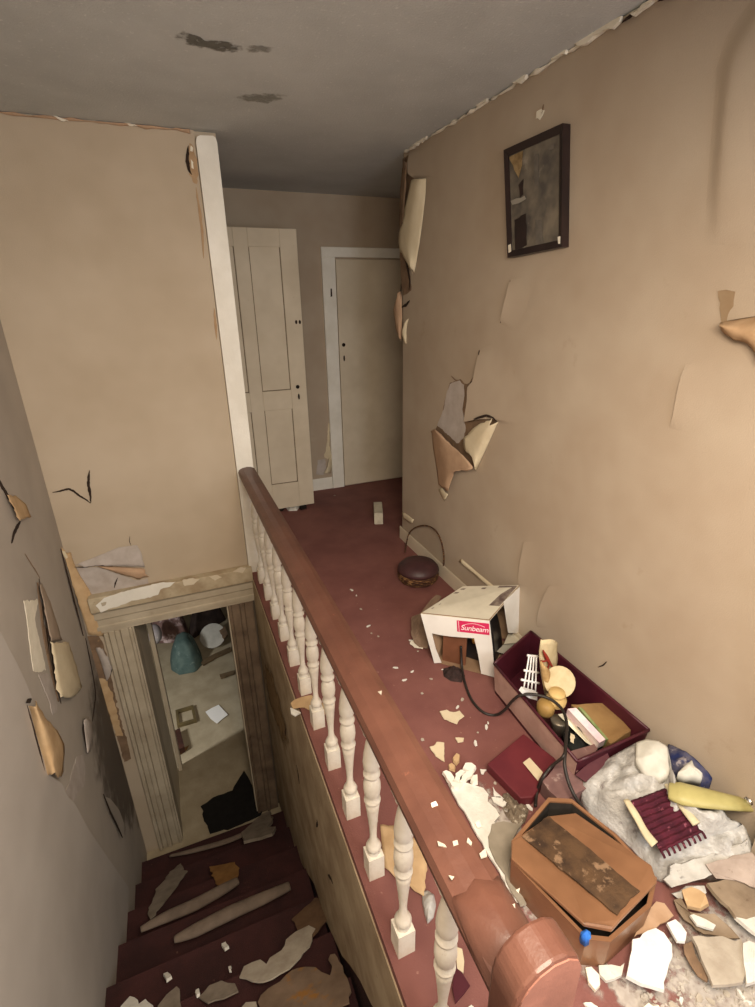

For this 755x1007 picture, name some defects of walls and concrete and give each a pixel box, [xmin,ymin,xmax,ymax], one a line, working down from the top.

leakage [179,34,267,52]
spalling [404,0,663,153]
peeling [437,381,466,443]
crack [0,481,31,543]
crack [52,468,92,503]
peeling [61,547,221,637]
peeling [23,554,82,715]